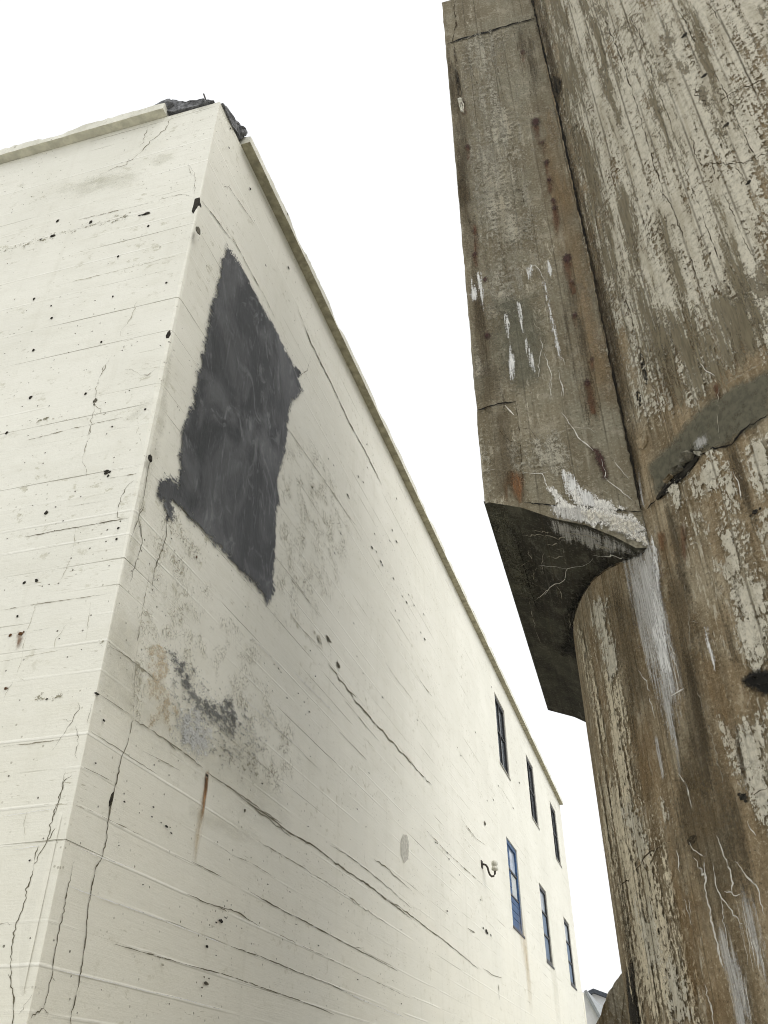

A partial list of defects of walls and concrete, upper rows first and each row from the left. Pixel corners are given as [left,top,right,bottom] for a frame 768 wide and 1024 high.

crack [29,365,150,475]
crack [300,315,382,485]
water stain [468,215,488,340]
water stain [499,303,534,380]
corrosion [544,160,558,232]
corrosion [563,253,575,294]
peeling [454,0,768,449]
water stain [531,0,768,529]
water stain [547,469,715,796]
crack [1,429,501,1024]
peeling [573,596,706,1024]
peeling [718,702,768,831]